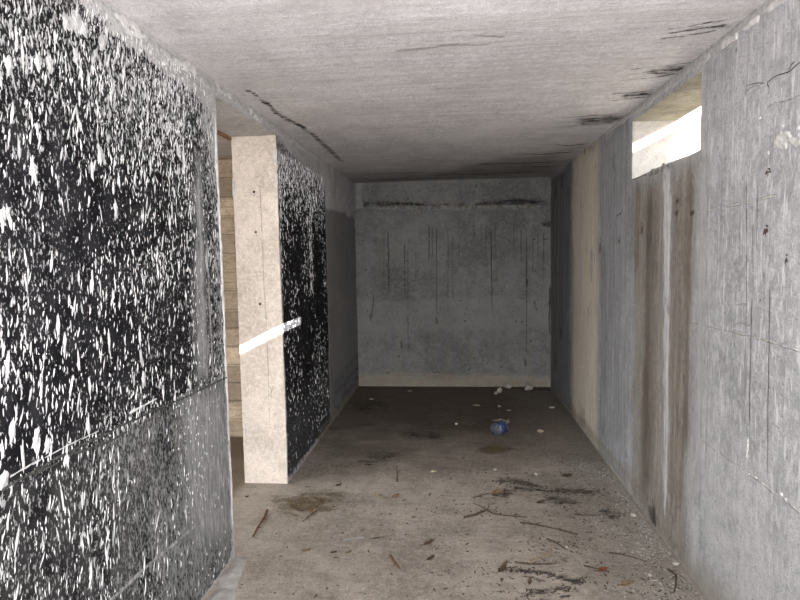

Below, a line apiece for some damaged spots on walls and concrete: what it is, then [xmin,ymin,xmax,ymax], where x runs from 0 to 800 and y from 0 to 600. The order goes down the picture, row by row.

crack [745,61,800,95]
leakage [529,115,709,556]